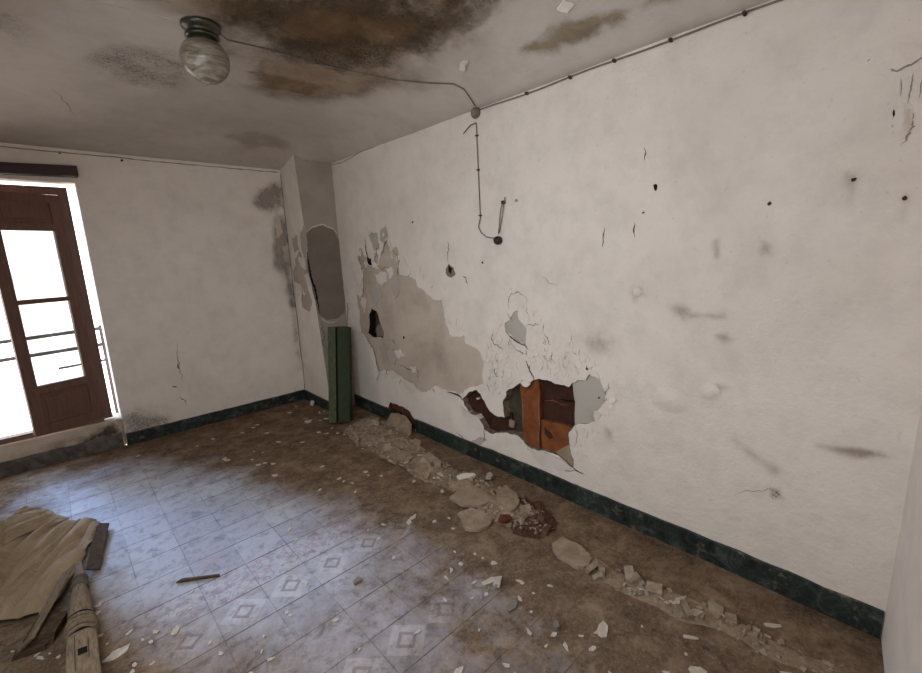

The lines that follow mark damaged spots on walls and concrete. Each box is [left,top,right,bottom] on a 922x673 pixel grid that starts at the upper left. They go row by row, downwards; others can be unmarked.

water stain [156,0,495,99]
water stain [525,13,622,50]
flaking render [292,226,312,312]
flaking render [356,226,607,474]